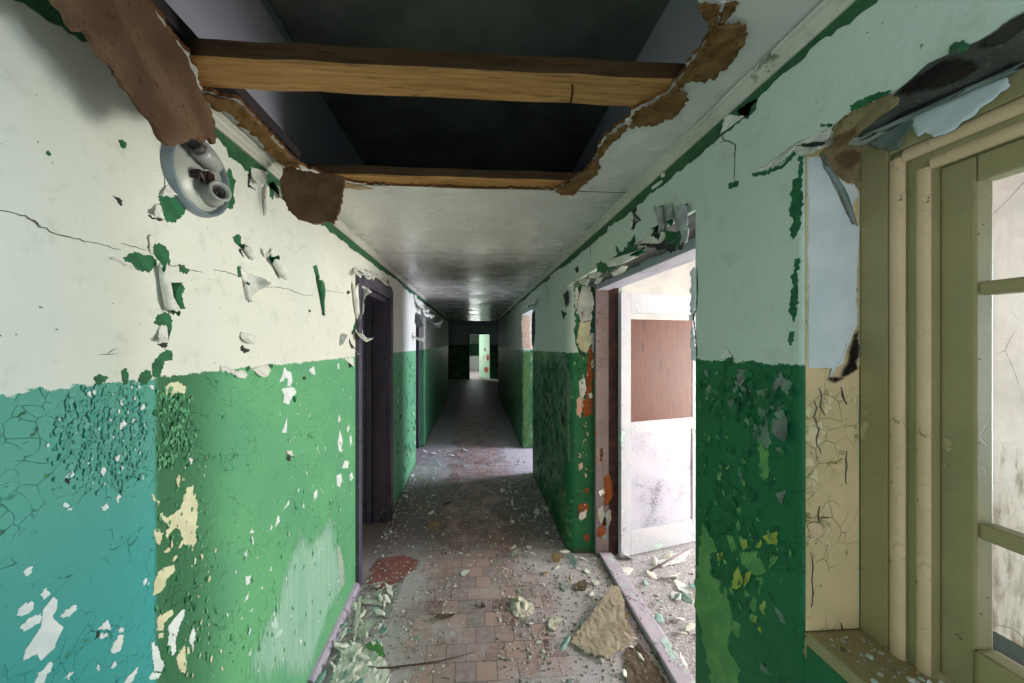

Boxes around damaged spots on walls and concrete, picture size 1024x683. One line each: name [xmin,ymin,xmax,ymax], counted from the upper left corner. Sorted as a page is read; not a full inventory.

crack [0,210,144,250]
peeling [93,235,190,400]
peeling [147,178,186,223]
peeling [202,93,301,216]
peeling [309,265,326,316]
peeling [322,222,448,369]
peeling [498,0,878,481]
peeling [751,61,1024,377]
flaking render [142,477,198,595]
flaking render [16,588,77,683]
flaking render [124,609,196,683]
peeling [657,524,786,683]